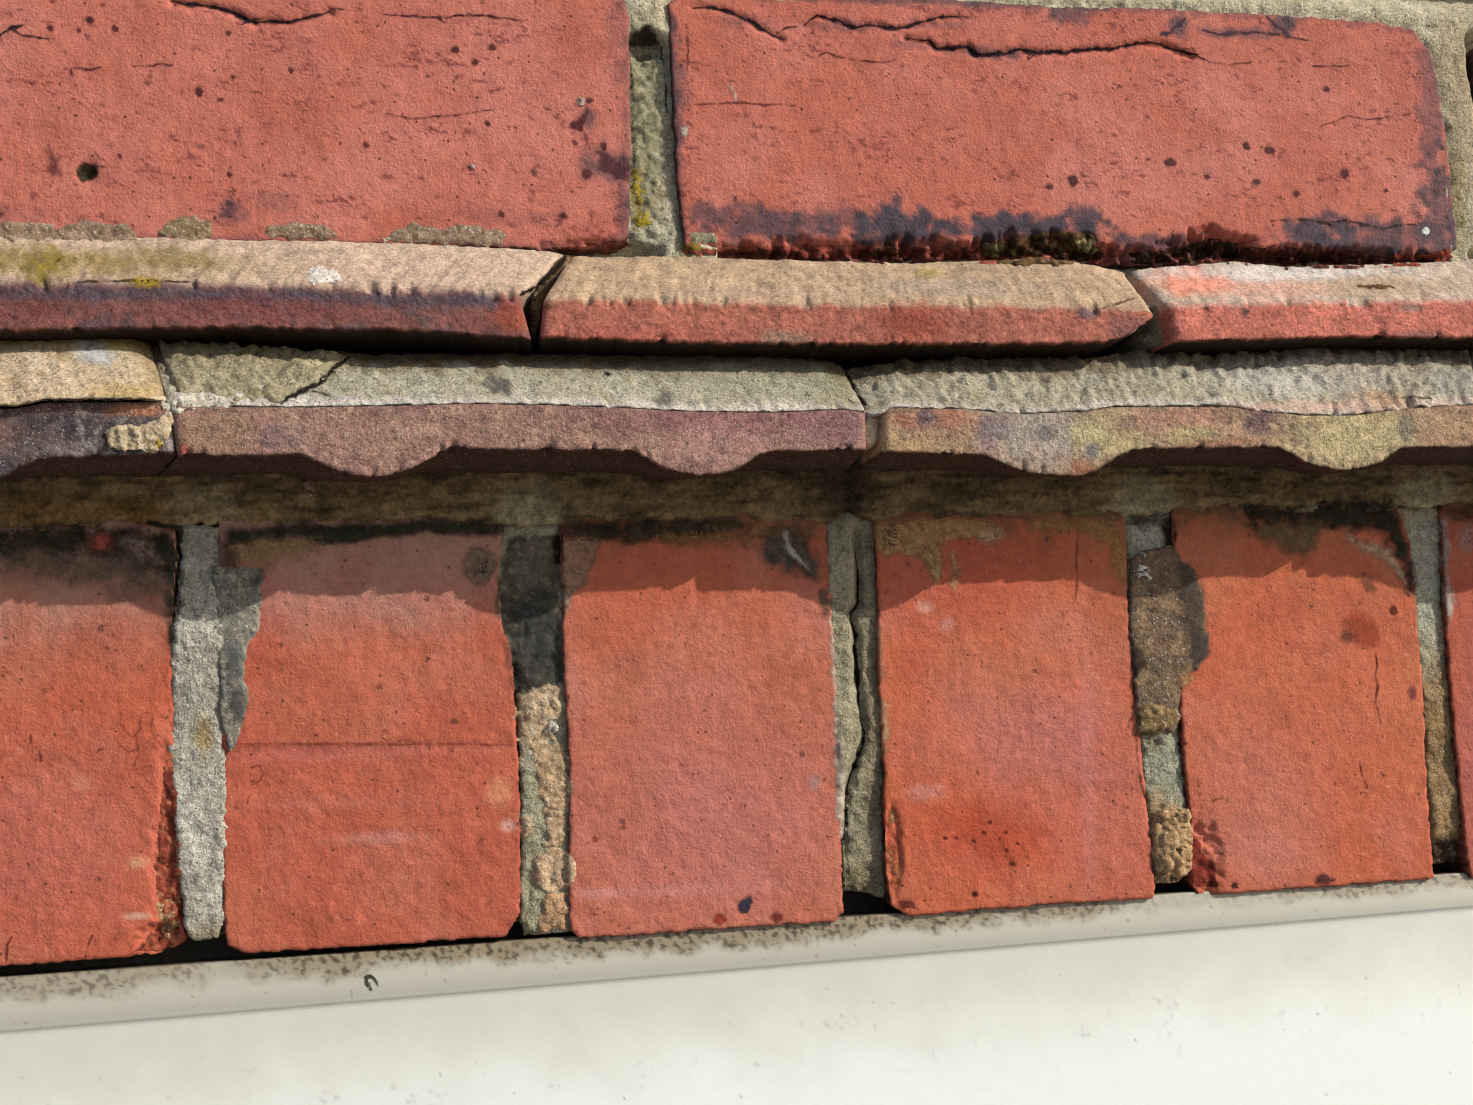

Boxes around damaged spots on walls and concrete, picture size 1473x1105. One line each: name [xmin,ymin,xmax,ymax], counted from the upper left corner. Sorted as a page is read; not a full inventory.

crack [0,25,173,75]
crack [172,1,344,25]
crack [629,5,1351,169]
crack [520,256,567,348]
crack [280,355,349,404]
water stain [0,534,182,656]
water stain [1254,504,1319,554]
water stain [1348,537,1406,584]
crack [841,552,866,878]
peeling [1135,702,1178,736]
peeling [512,683,576,932]
peeling [1150,805,1219,887]